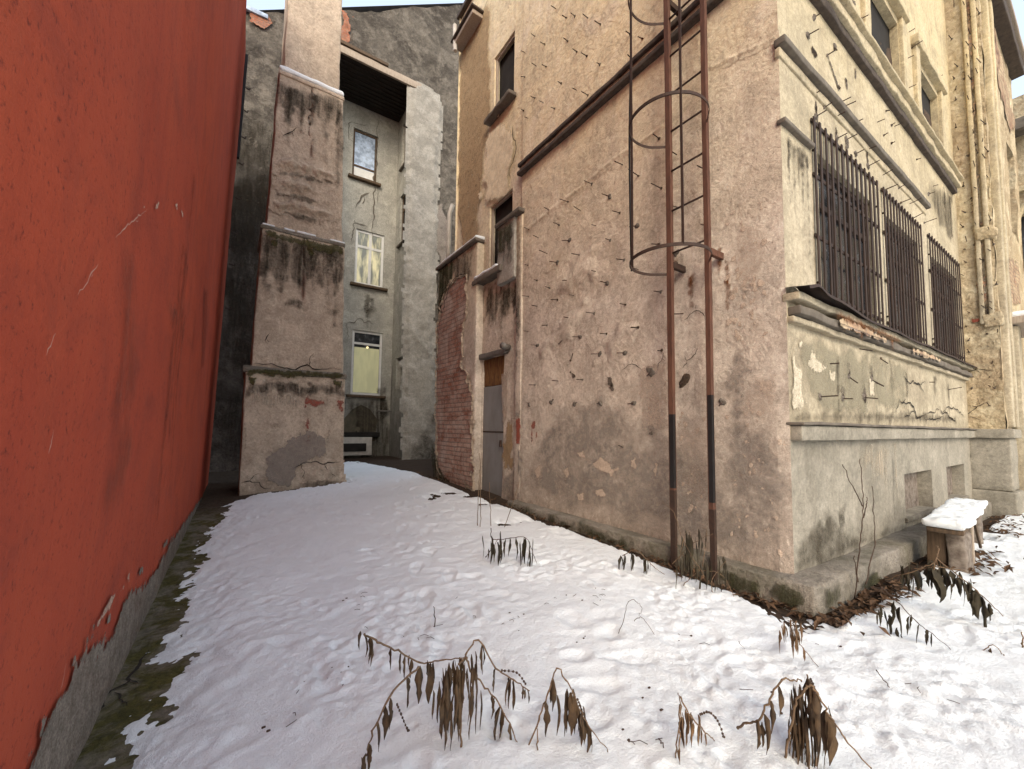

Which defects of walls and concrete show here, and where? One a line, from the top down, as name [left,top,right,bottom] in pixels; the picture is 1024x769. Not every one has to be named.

crack [348,122,379,251]
crack [255,334,341,370]
flaking render [412,272,476,491]
peeling [792,341,906,413]
flaking render [840,318,887,343]
flaking render [913,349,940,362]
crack [896,376,984,421]
peeling [29,497,203,769]